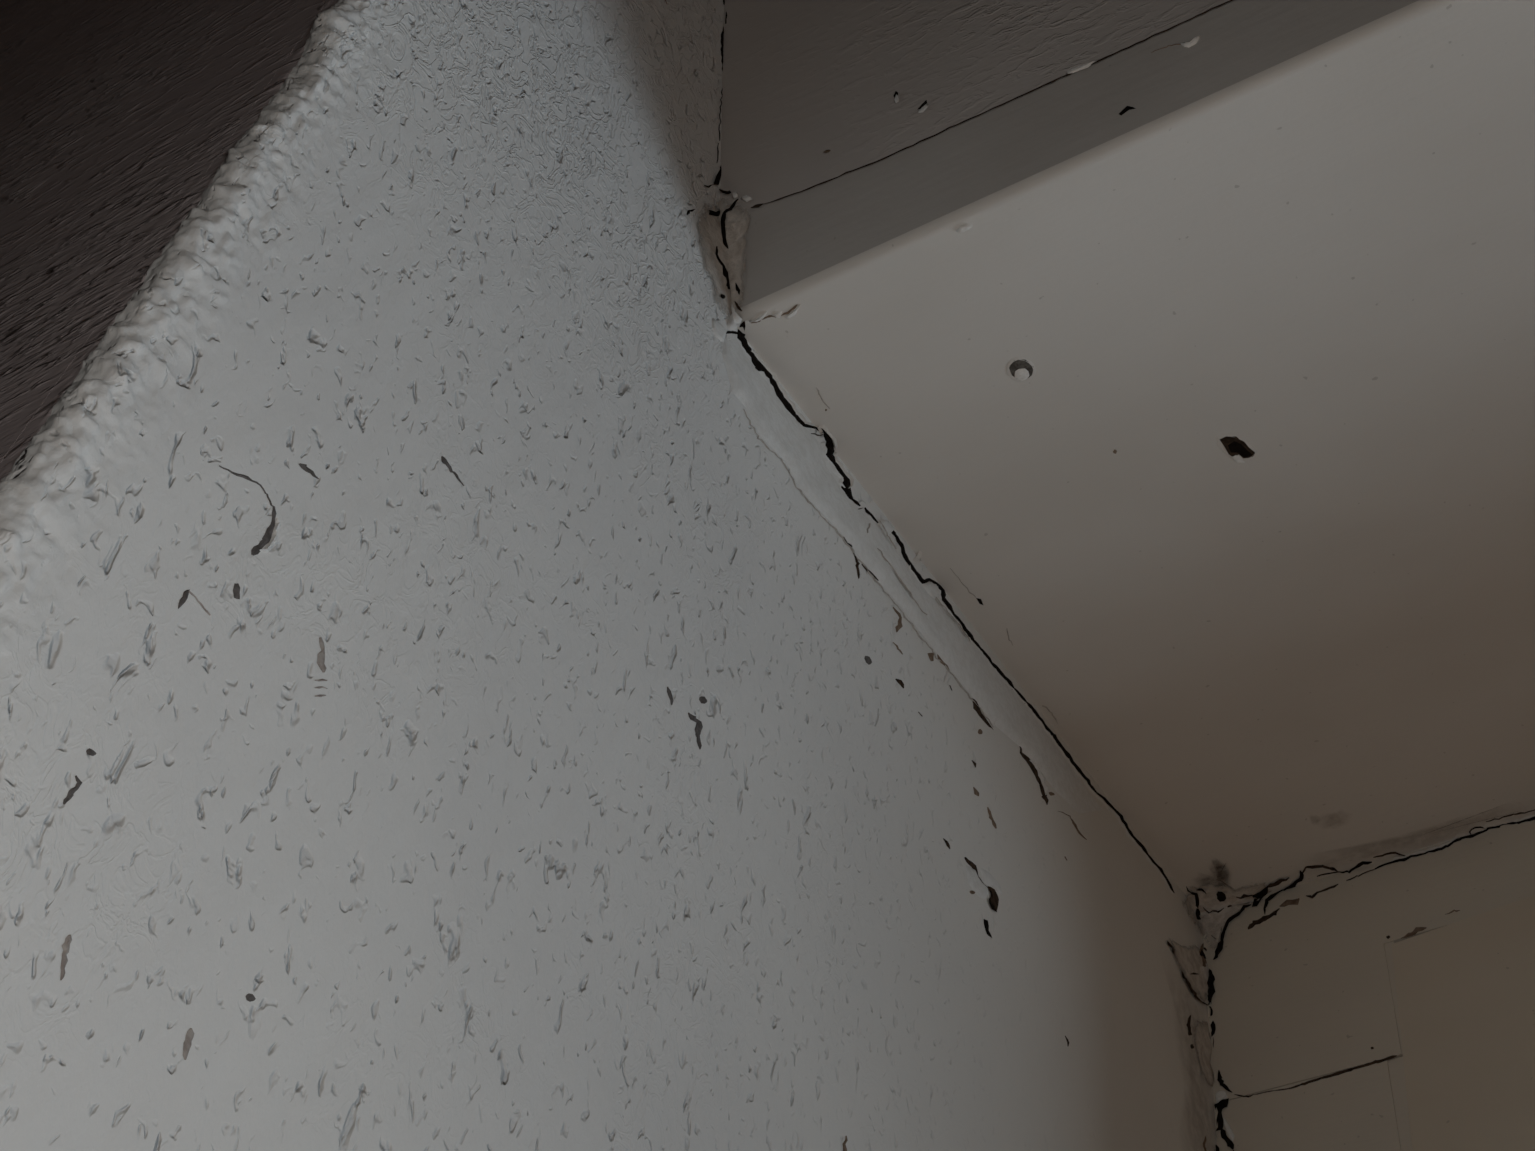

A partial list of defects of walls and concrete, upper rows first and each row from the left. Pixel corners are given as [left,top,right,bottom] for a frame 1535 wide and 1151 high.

crack [718,0,727,141]
crack [764,0,1233,204]
spalling [687,143,801,342]
crack [726,322,1175,894]
crack [1302,810,1535,881]
crack [1186,1006,1397,1151]